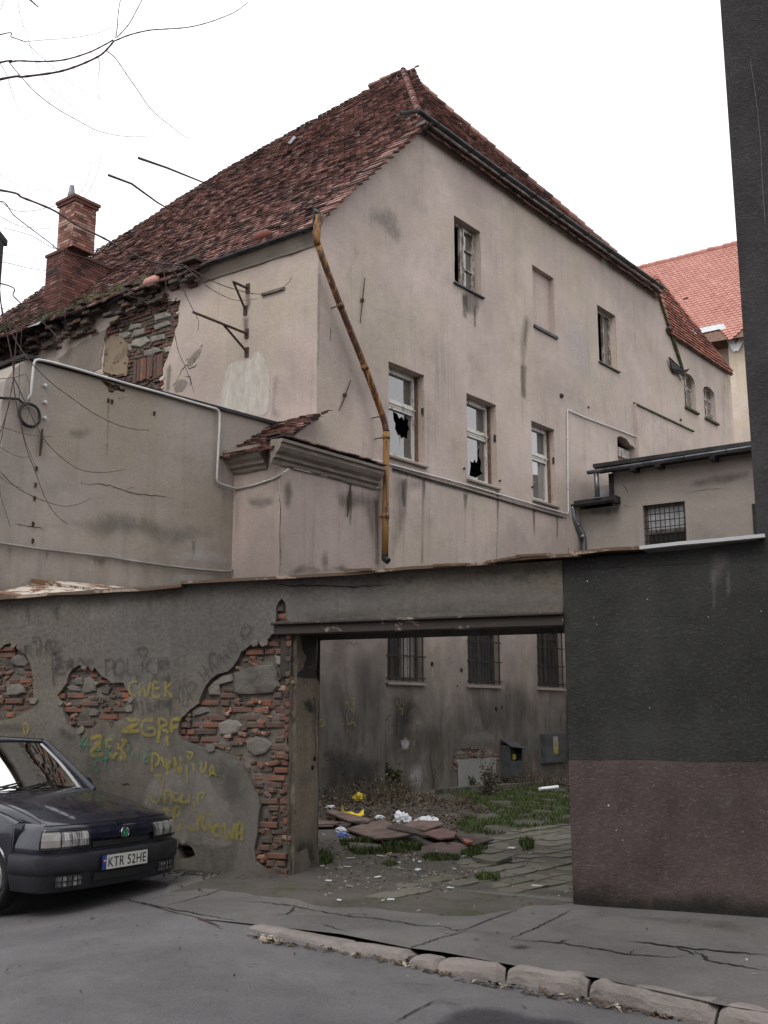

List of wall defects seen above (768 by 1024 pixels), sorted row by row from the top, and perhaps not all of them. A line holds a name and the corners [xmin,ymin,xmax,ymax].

flaking render [102,297,187,393]
spalling [0,642,39,721]
spalling [58,665,134,735]
spalling [180,600,297,875]